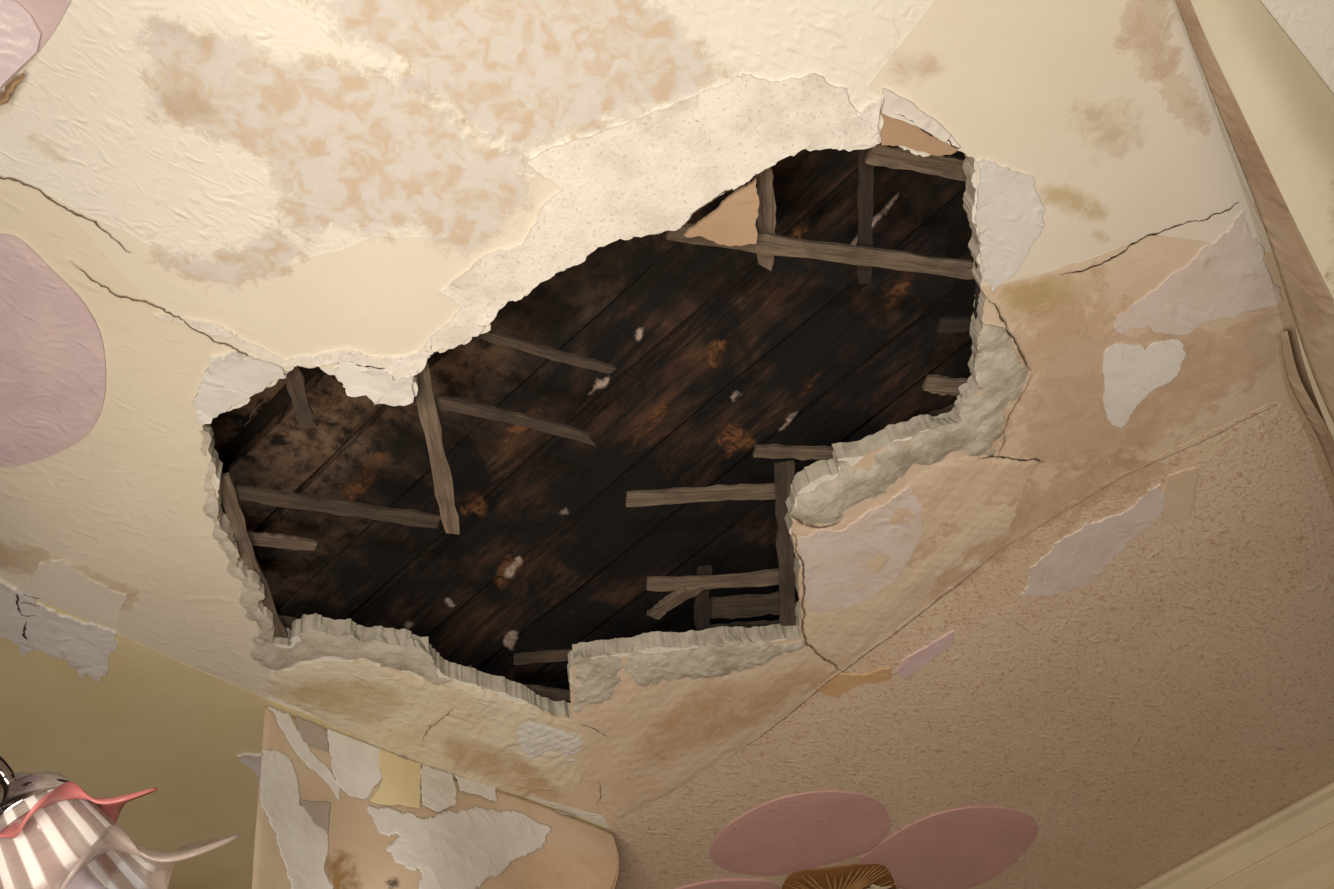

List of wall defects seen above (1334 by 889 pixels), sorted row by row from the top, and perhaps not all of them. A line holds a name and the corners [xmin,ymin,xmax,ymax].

peeling [0,72,25,105]
crack [0,177,131,253]
crack [71,262,289,425]
damp [144,0,727,285]
crack [980,296,1040,462]
crack [1062,202,1239,275]
peeling [1102,211,1283,428]
peeling [0,558,127,684]
peeling [154,73,1044,889]
peeling [1020,484,1165,597]